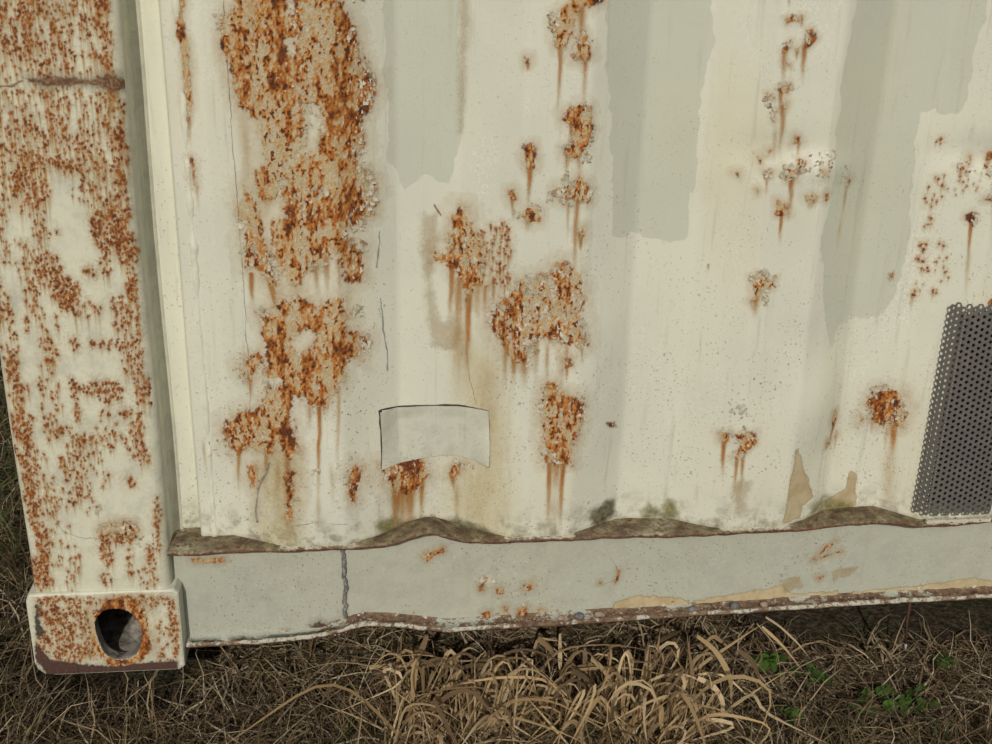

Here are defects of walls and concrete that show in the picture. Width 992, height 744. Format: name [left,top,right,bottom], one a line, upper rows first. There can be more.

corrosion [546,0,604,84]
corrosion [561,101,595,164]
corrosion [212,0,379,525]
corrosion [433,142,590,373]
corrosion [536,382,589,506]
corrosion [860,383,909,448]
corrosion [380,458,430,519]
peeling [783,450,813,523]
peeling [825,471,857,507]
corrosion [88,596,152,667]
peeling [613,585,838,609]
peeling [852,578,992,594]